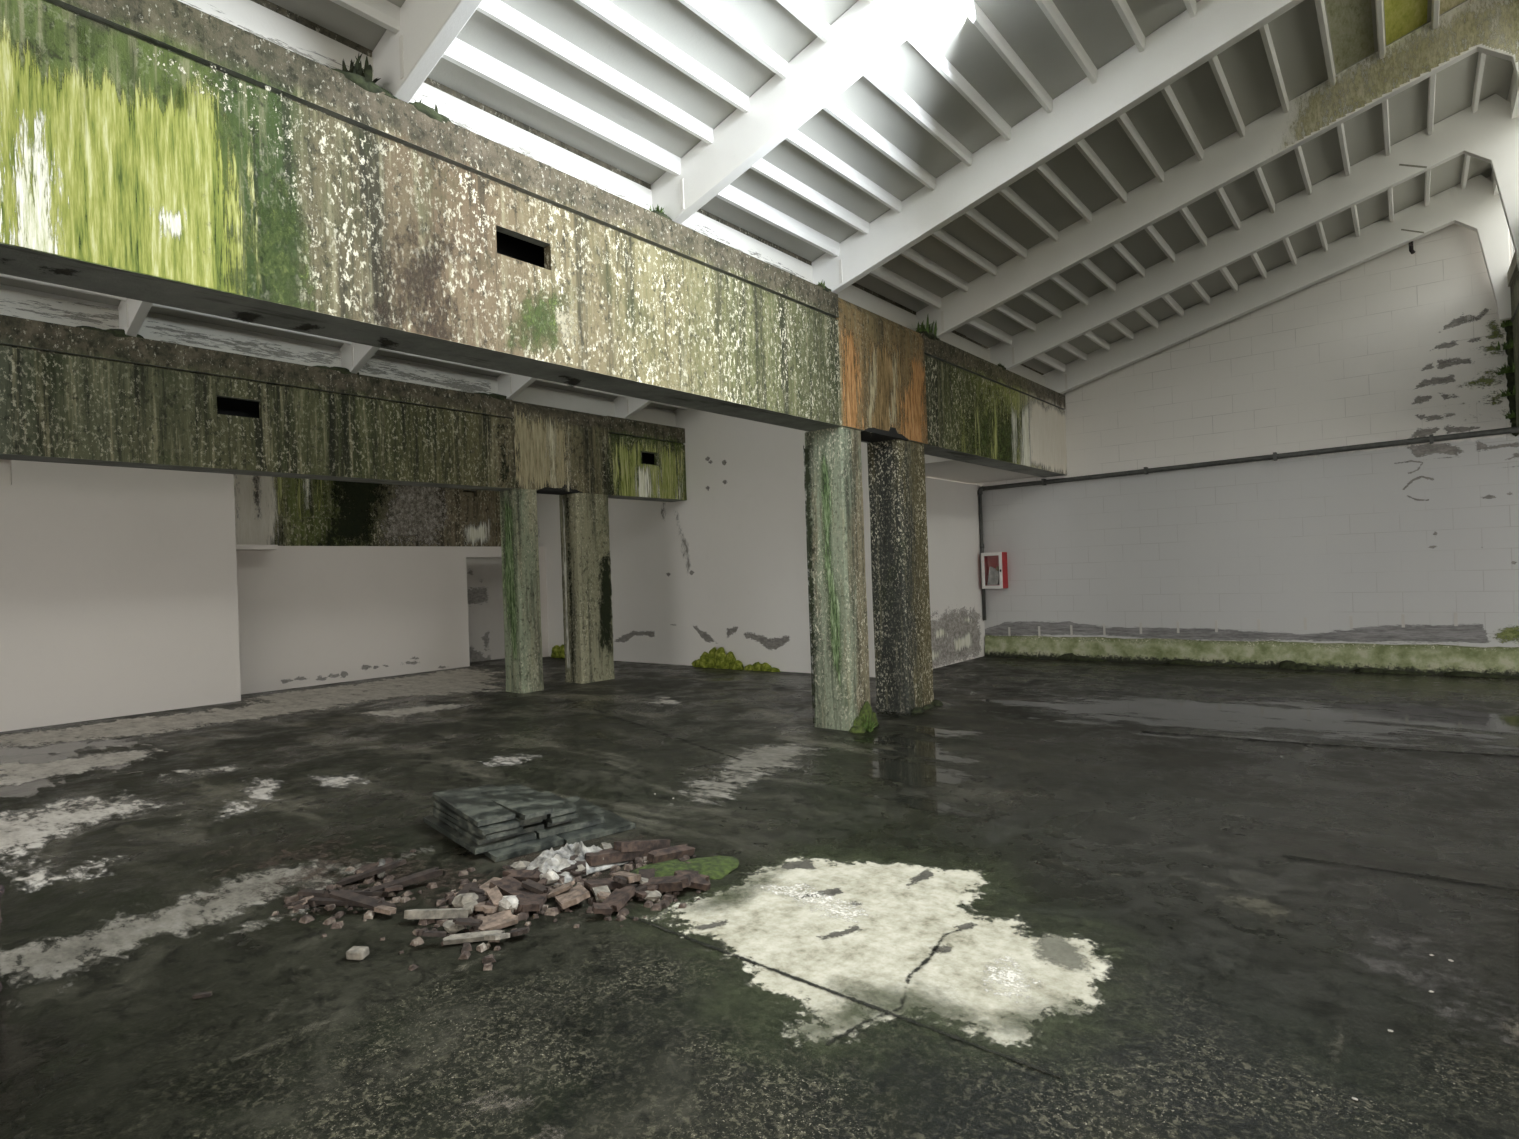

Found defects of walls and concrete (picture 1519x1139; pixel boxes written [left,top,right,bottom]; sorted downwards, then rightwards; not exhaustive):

damp [0,109,69,254]
damp [147,52,317,247]
damp [555,301,576,344]
corrosion [841,327,927,443]
peeling [1407,308,1519,460]
peeling [614,631,655,642]
peeling [693,626,790,650]
peeling [931,606,1489,669]
crack [614,911,1061,1077]
damp [652,852,1120,1055]